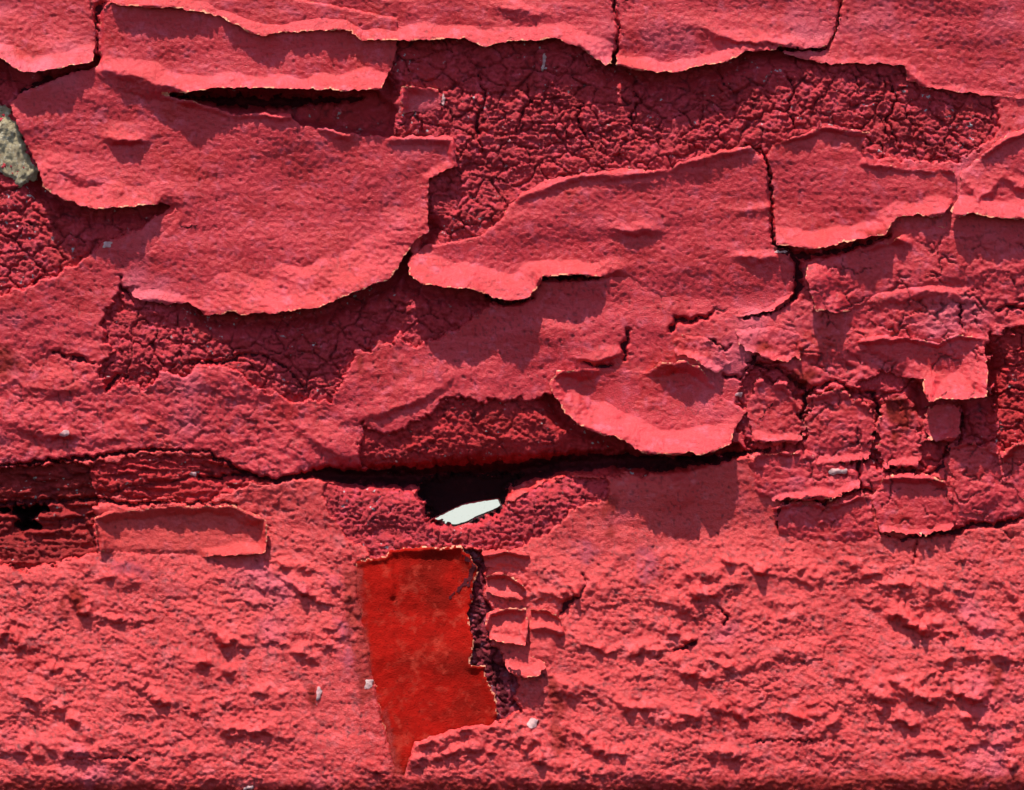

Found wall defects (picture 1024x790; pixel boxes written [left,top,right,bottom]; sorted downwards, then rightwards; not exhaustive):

crack [610,0,628,66]
crack [475,74,487,150]
crack [554,103,593,147]
crack [885,84,898,141]
peeling [0,0,1024,403]
peeling [0,454,271,571]
crack [0,447,772,507]
peeling [323,326,1024,775]